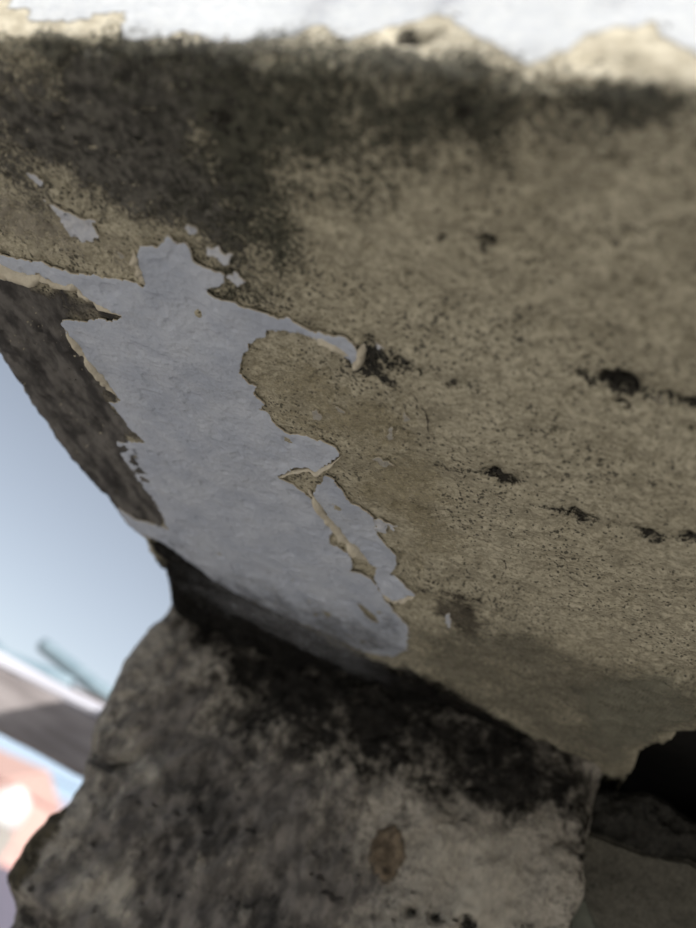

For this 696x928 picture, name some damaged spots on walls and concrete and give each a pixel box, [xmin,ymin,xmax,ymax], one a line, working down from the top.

peeling [26,172,45,187]
peeling [43,198,100,243]
leakage [0,23,696,305]
leakage [0,279,165,529]
peeling [0,224,418,657]
leakage [346,332,422,388]
leakage [148,538,696,859]
leakage [65,767,237,919]